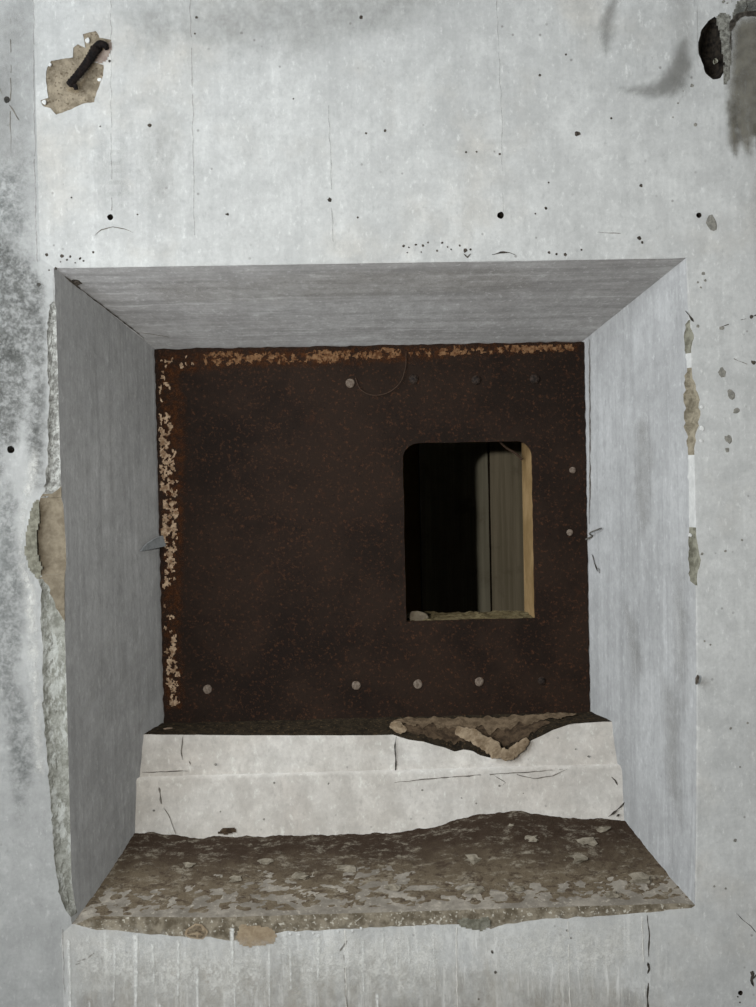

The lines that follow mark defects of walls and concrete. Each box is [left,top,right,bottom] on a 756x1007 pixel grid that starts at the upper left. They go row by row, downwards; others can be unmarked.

spalling [41,31,112,114]
leakage [730,2,756,151]
leakage [0,244,42,467]
spalling [684,320,699,354]
spalling [683,367,704,455]
leakage [1,500,43,628]
corrosion [161,347,450,707]
spalling [37,301,695,948]
spalling [688,527,703,585]